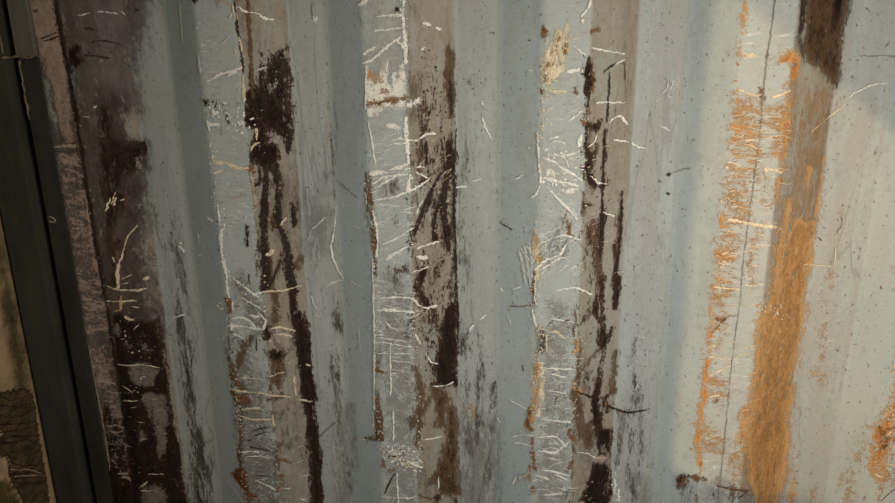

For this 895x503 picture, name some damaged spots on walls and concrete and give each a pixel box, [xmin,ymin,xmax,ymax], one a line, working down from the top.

corrosion [83,92,189,503]
corrosion [217,280,234,314]
corrosion [225,0,325,503]
corrosion [359,122,388,447]
corrosion [388,40,462,503]
corrosion [518,352,546,501]
corrosion [529,232,563,327]
peeling [536,305,582,355]
peeling [528,22,594,290]
corrosion [566,113,644,503]
corrosion [676,0,851,503]
corrosion [841,356,895,502]